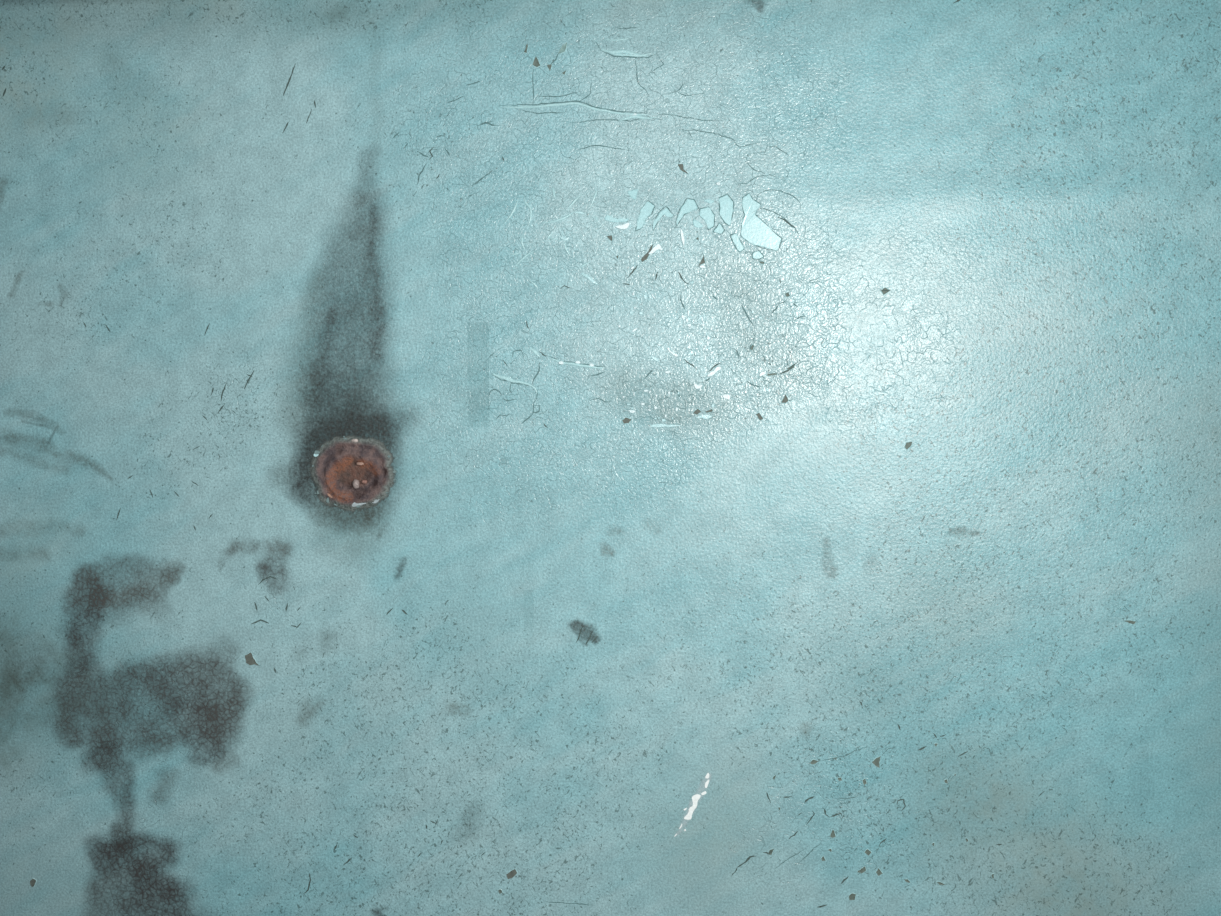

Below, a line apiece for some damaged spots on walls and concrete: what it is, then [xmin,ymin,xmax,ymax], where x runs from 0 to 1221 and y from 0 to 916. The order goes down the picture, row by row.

crack [393,81,480,195]
crack [478,27,801,235]
peeling [505,182,782,332]
water stain [292,205,398,526]
crack [489,321,609,428]
peeling [621,256,722,427]
peeling [693,394,731,419]
peeling [735,281,805,404]
rust [310,436,397,511]
peeling [674,773,709,837]